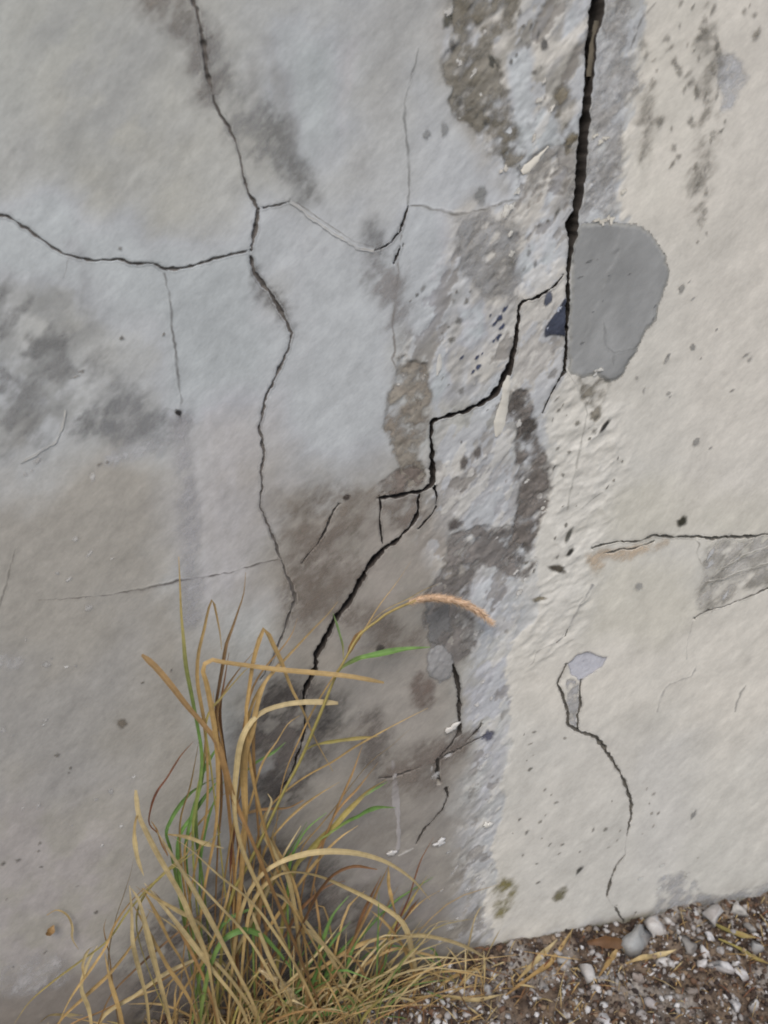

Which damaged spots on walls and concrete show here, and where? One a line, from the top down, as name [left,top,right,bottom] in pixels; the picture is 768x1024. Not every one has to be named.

spalling [443,0,637,297]
water stain [87,395,164,465]
crack [0,0,522,680]
spalling [384,360,432,494]
crack [273,0,608,801]
water stain [461,447,481,468]
water stain [292,488,417,618]
crack [380,664,483,856]
crack [527,583,637,923]
peeling [566,652,607,726]
crack [592,532,768,713]